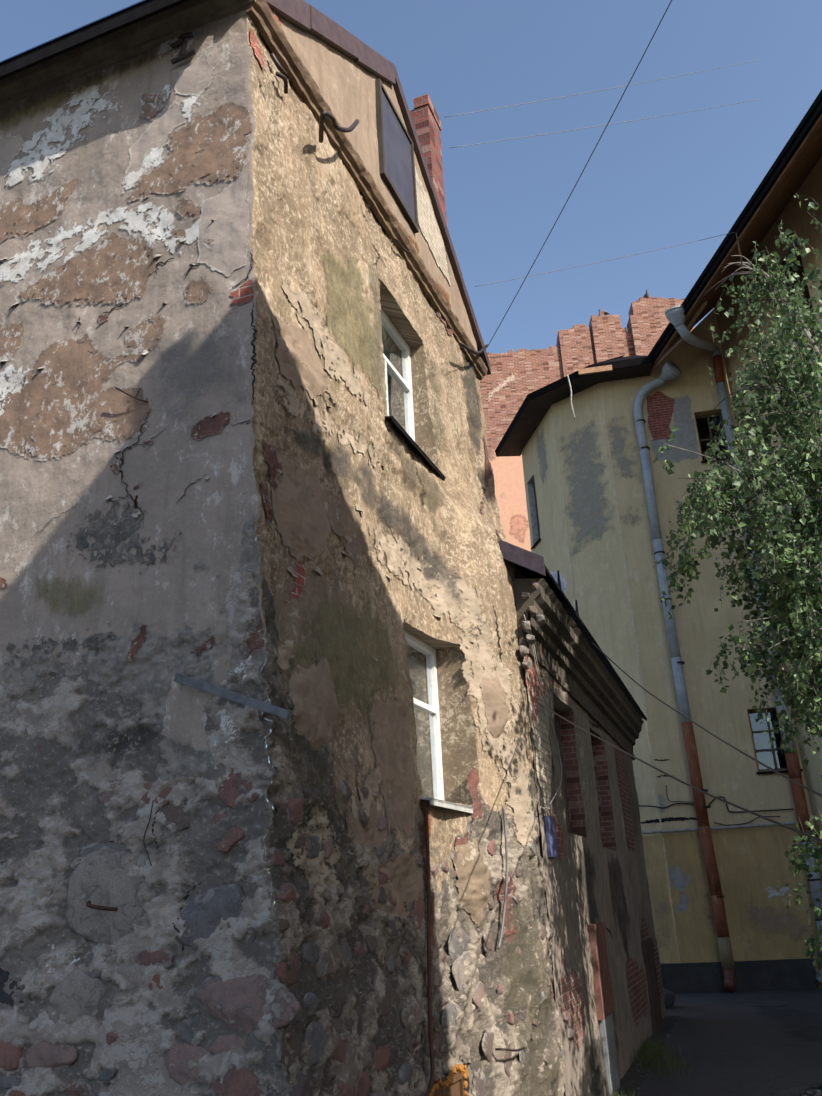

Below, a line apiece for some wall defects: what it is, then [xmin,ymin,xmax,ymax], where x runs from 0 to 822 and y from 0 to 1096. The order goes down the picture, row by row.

peeling [0,31,254,474]
crack [107,410,162,519]
spalling [260,443,284,525]
spalling [480,437,529,543]
peeling [646,391,700,463]
flaking render [0,481,585,1096]